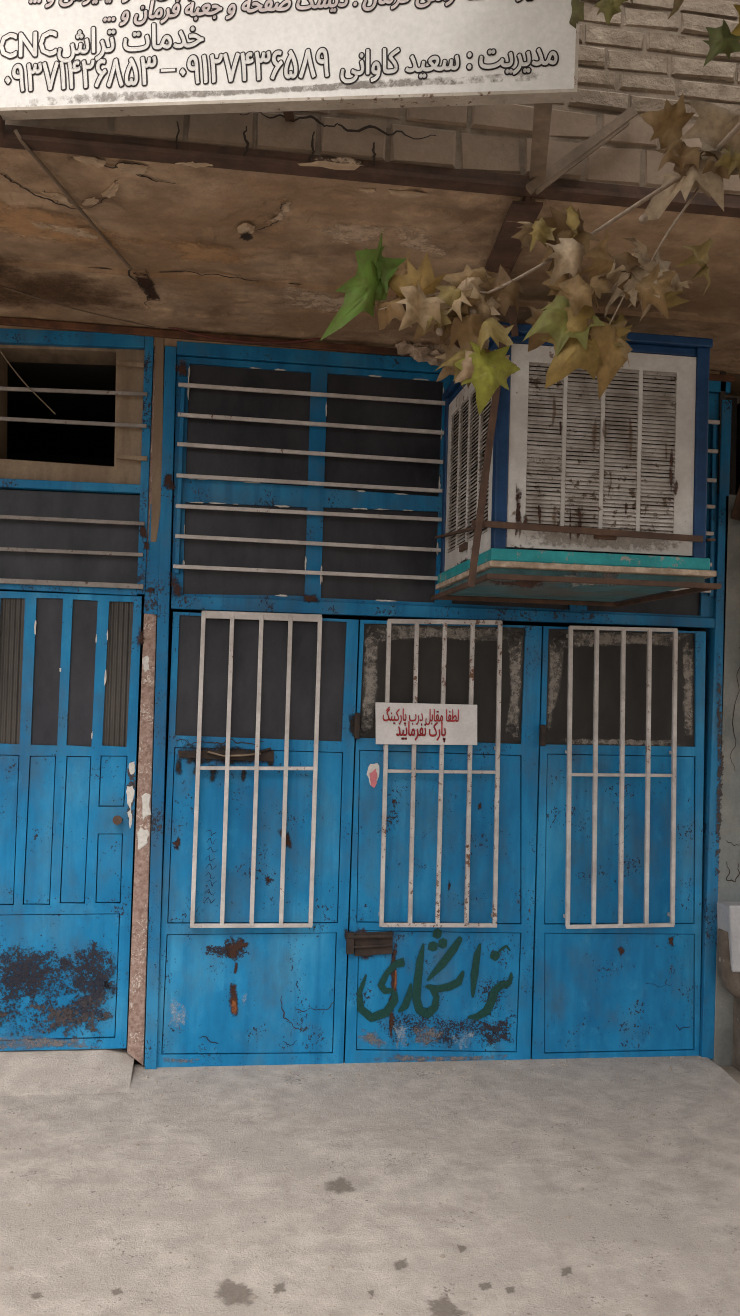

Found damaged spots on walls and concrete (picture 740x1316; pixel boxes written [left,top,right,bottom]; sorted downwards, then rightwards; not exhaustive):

crack [0,173,120,209]
spalling [237,203,291,241]
spalling [395,340,450,381]
corrosion [665,448,678,495]
corrosion [515,487,675,550]
peeling [126,761,151,850]
corrosion [201,936,249,1015]